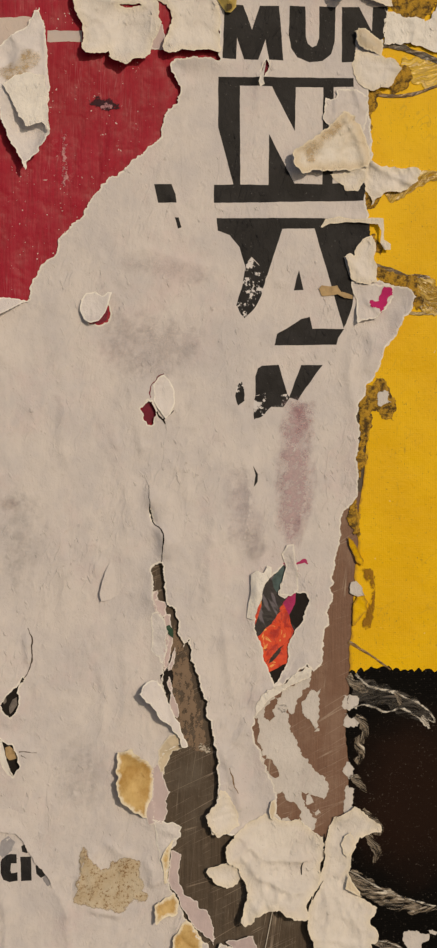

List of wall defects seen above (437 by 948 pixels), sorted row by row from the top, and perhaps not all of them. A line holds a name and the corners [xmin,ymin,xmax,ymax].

peeling [73,0,222,64]
peeling [0,8,50,170]
peeling [293,0,437,205]
peeling [321,216,391,284]
peeling [80,292,112,323]
peeling [376,390,390,406]
crack [148,497,164,562]
peeling [247,544,298,619]
peeling [350,581,368,626]
crack [22,629,33,682]
peeling [115,680,188,884]
peeling [206,790,382,948]